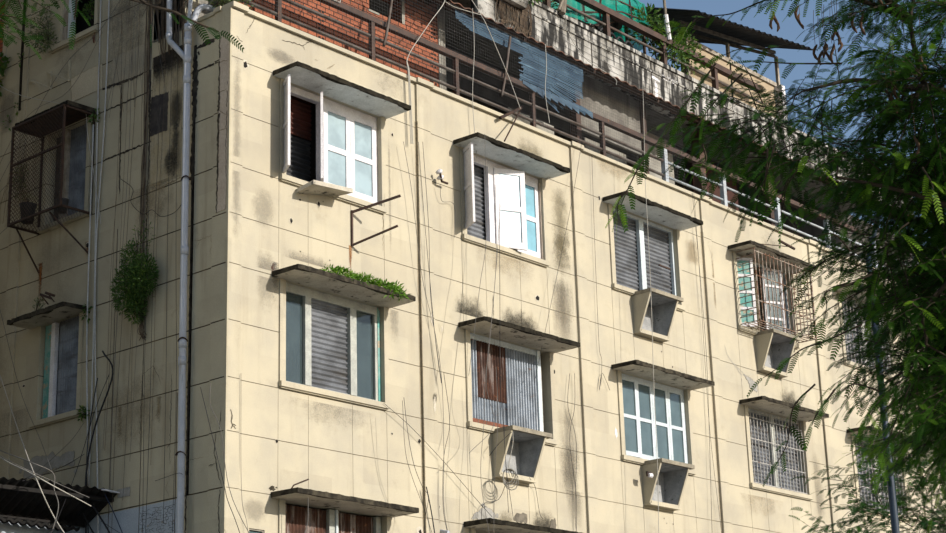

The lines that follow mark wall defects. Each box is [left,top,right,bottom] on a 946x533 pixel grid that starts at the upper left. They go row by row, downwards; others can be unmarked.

water stain [100,36,219,531]
water stain [457,303,494,318]
water stain [504,313,535,330]